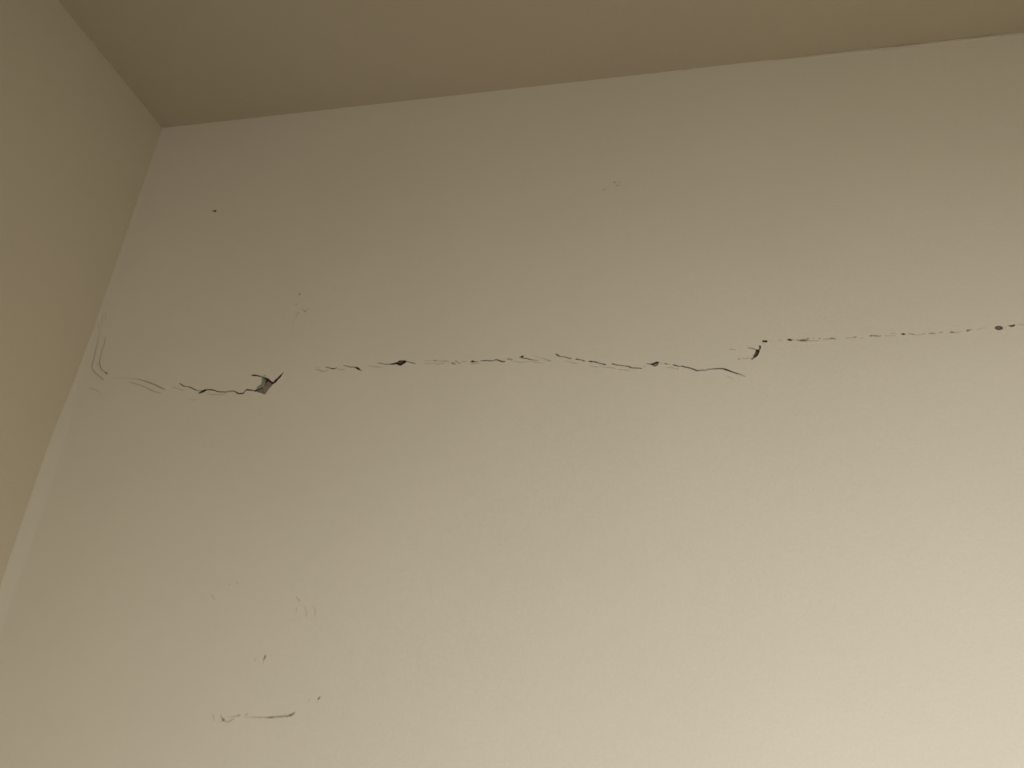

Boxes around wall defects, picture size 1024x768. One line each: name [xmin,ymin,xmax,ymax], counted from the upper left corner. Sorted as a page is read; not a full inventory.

crack [788,337,835,345]
crack [471,356,530,364]
crack [556,354,738,376]
crack [181,383,246,394]
spalling [246,373,284,396]